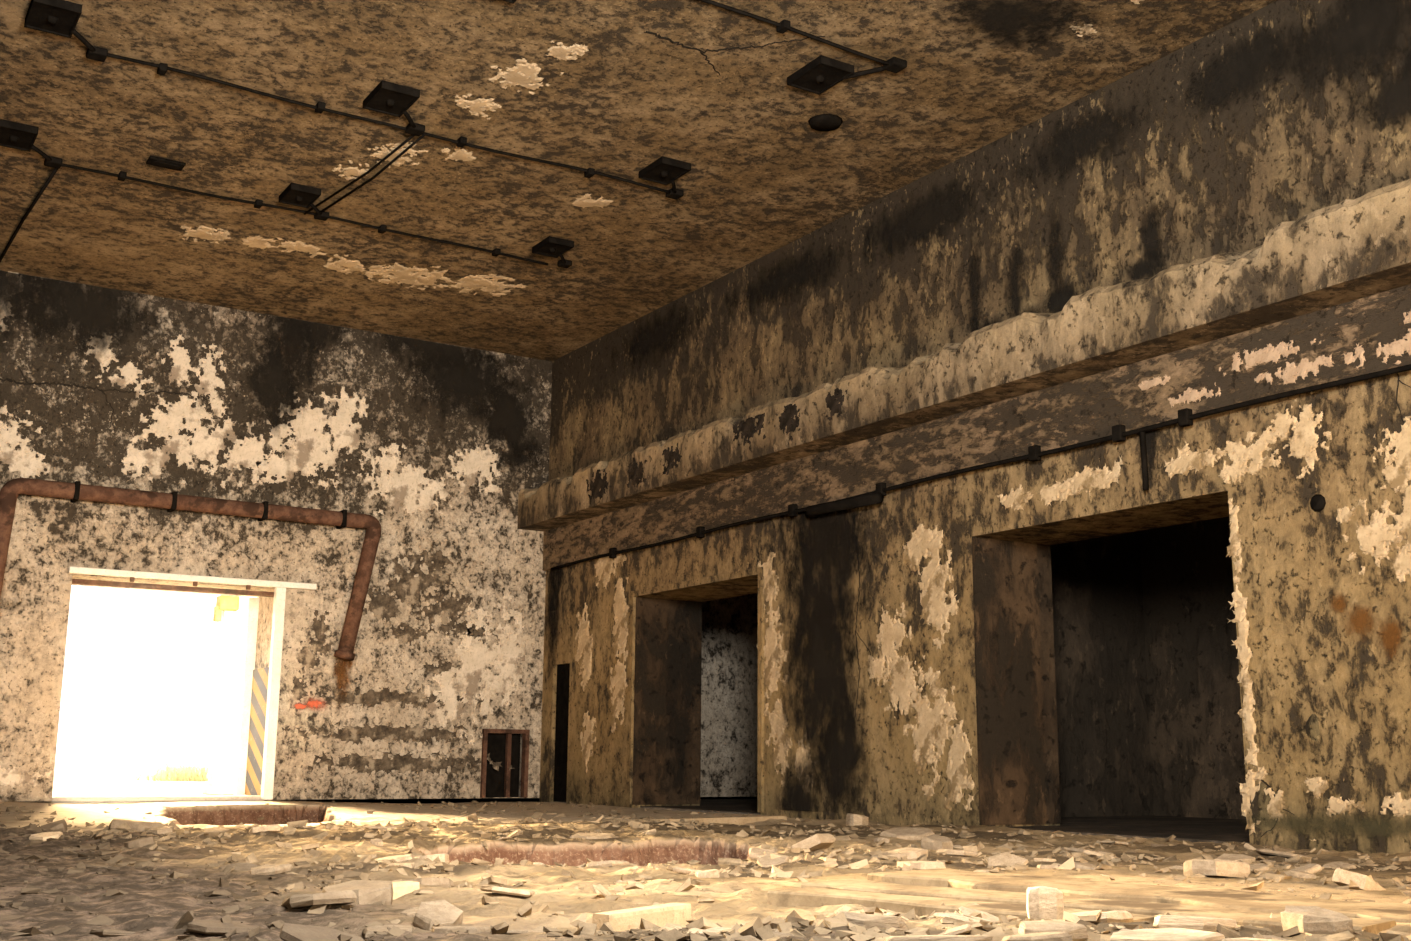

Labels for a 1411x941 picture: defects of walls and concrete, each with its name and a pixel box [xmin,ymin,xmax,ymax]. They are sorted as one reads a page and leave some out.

peeling [455,41,589,120]
leakage [0,271,157,349]
peeling [179,224,526,297]
leakage [969,222,1076,332]
leakage [1130,206,1161,280]
flaking render [0,405,51,478]
leakage [250,348,294,427]
flaking render [84,334,502,517]
rust [336,660,352,693]
flaking render [362,566,526,777]
leakage [781,519,868,813]
flaking render [867,523,975,811]